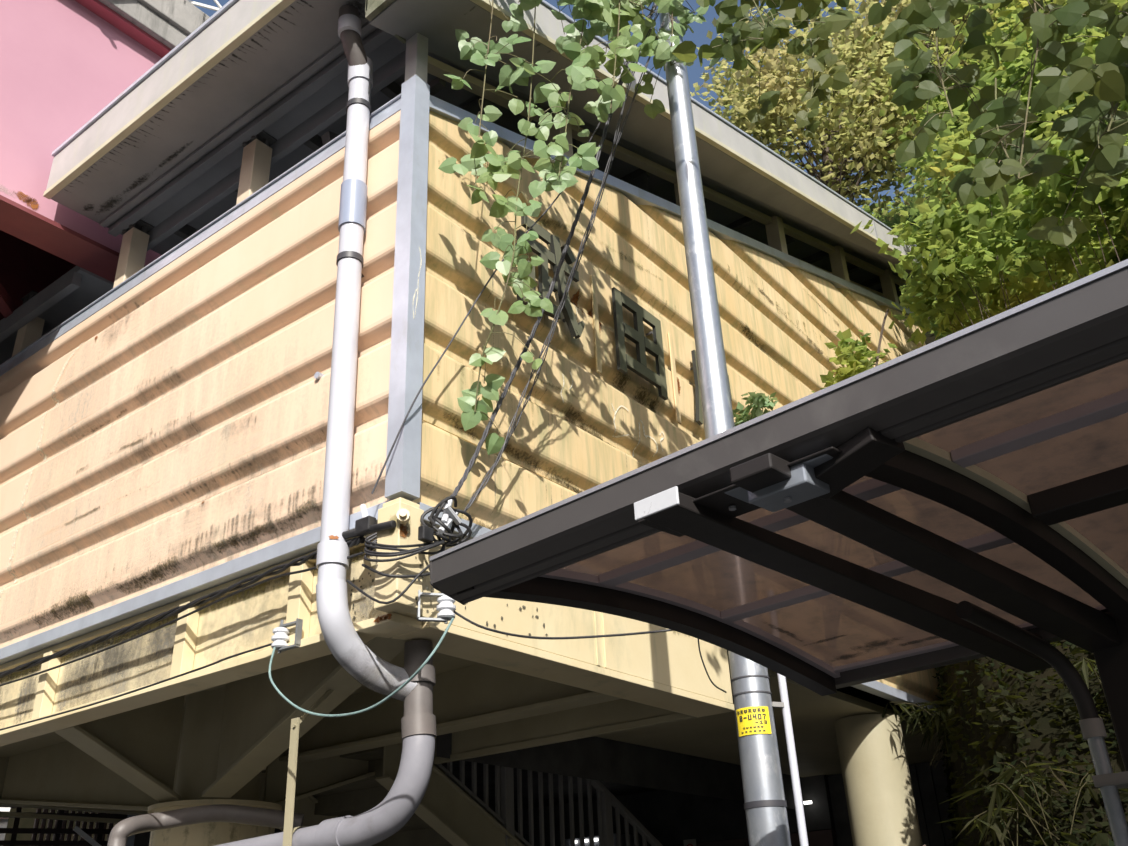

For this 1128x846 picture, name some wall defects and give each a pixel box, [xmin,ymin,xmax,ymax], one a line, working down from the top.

corrosion [17,191,39,210]
water stain [200,576,286,613]
water stain [113,614,178,645]